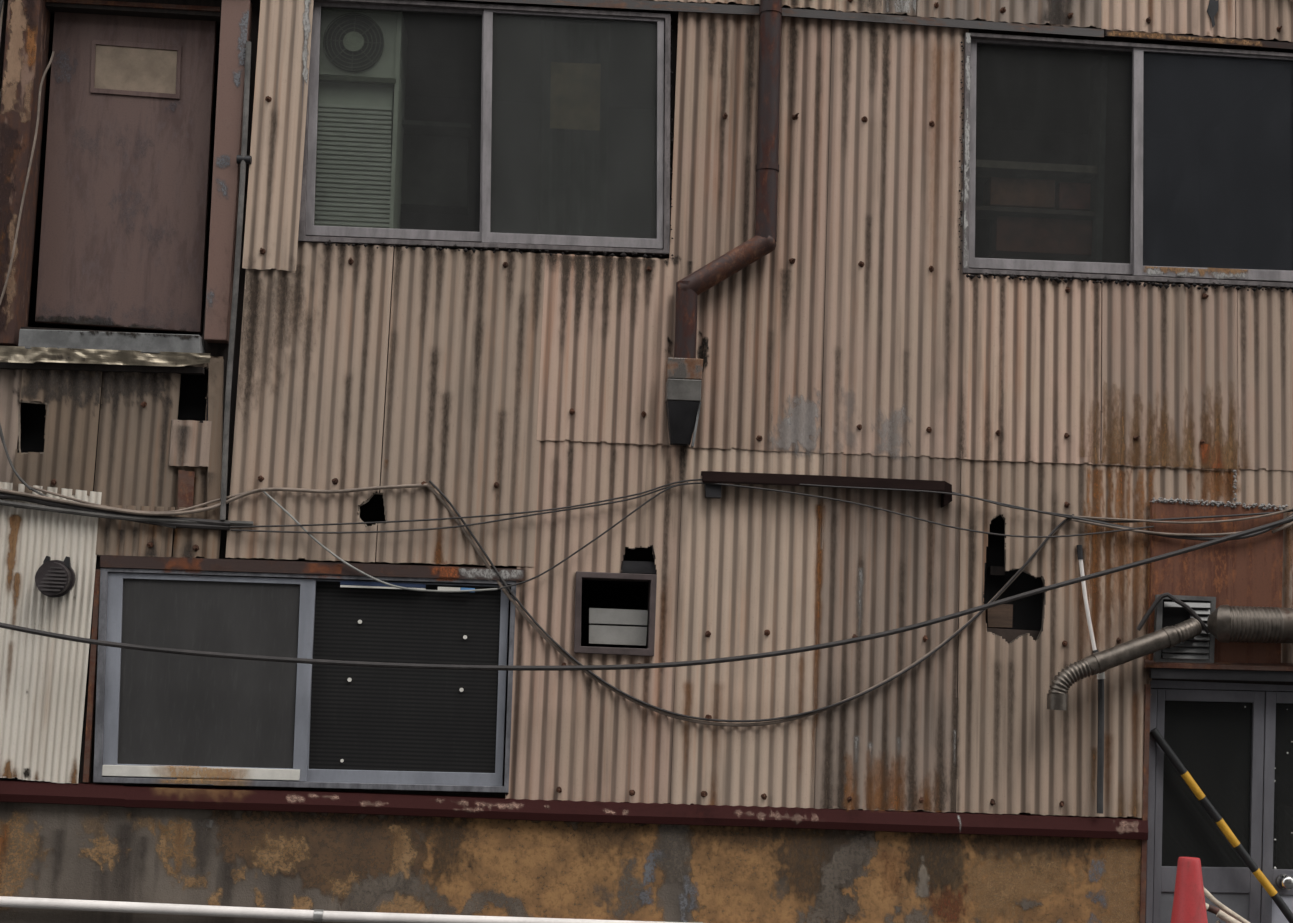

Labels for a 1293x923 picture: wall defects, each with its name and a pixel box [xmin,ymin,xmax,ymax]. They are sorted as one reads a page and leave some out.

peeling [79,823,130,872]
peeling [128,794,666,922]
peeling [679,812,1141,923]